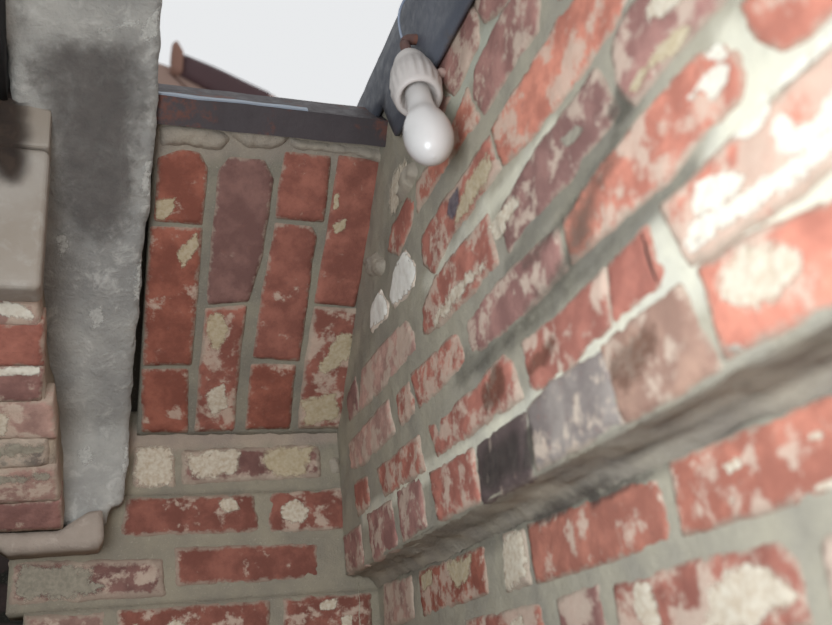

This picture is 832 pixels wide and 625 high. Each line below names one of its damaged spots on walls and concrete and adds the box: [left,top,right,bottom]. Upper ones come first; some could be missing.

damp [0,86,26,180]
damp [43,45,130,227]